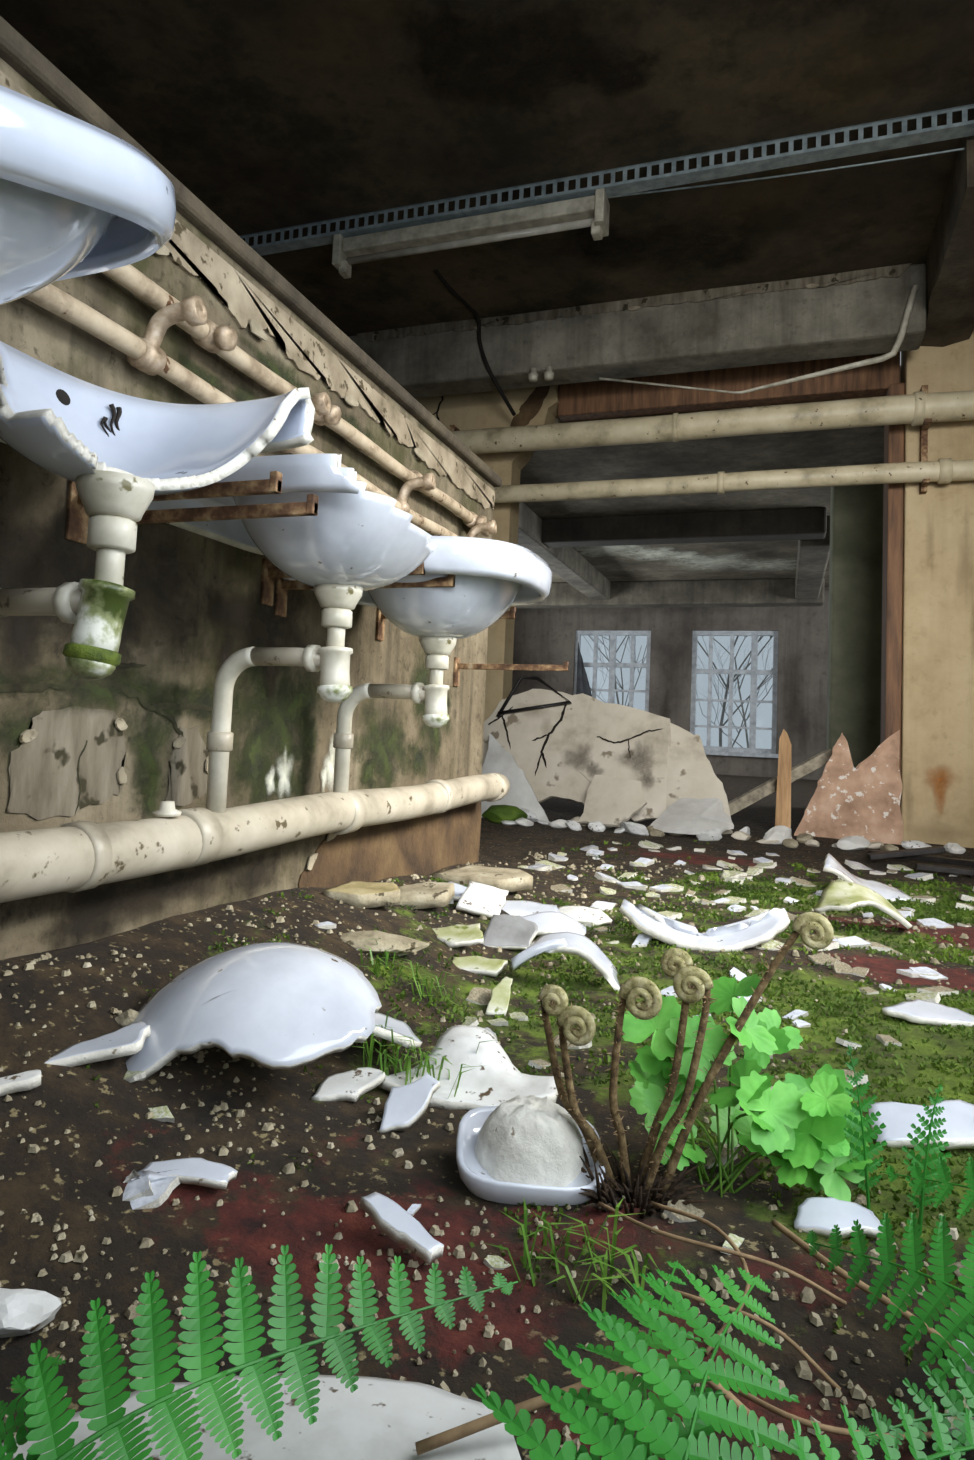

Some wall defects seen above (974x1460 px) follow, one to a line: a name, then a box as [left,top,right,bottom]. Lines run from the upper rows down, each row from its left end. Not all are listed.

flaking render [0,70,35,100]
flaking render [155,219,495,510]
peeling [5,706,128,820]